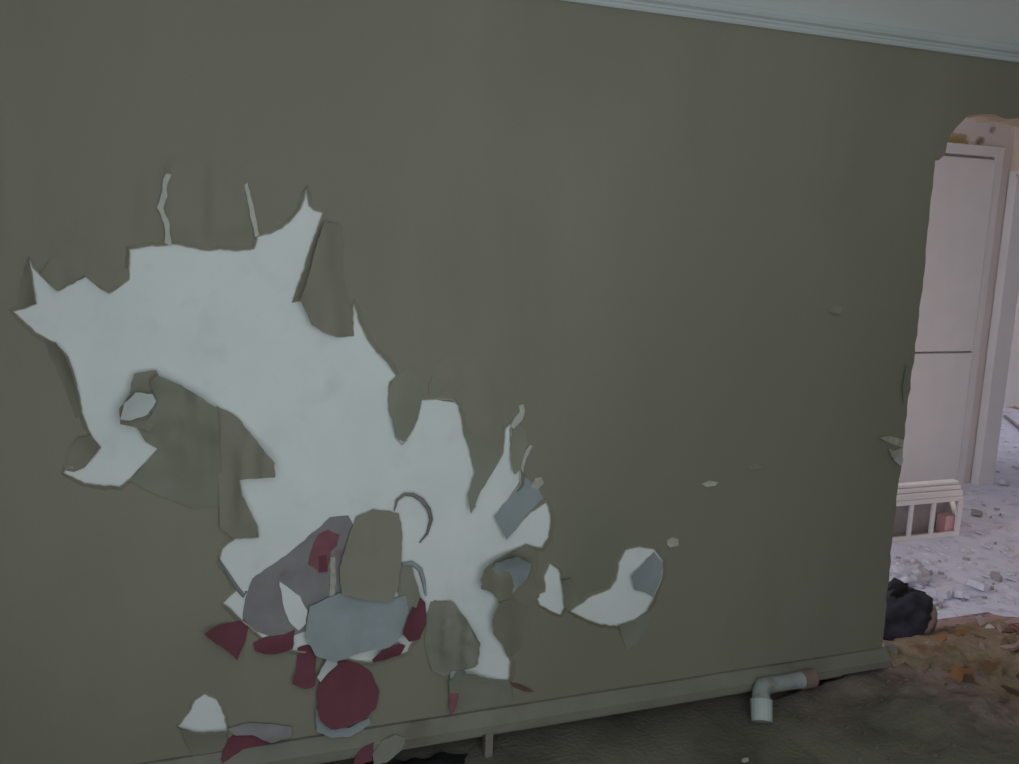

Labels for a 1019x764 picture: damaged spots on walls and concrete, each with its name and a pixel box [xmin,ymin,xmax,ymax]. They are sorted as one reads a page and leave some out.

peeling [176,692,293,763]
peeling [8,173,679,738]